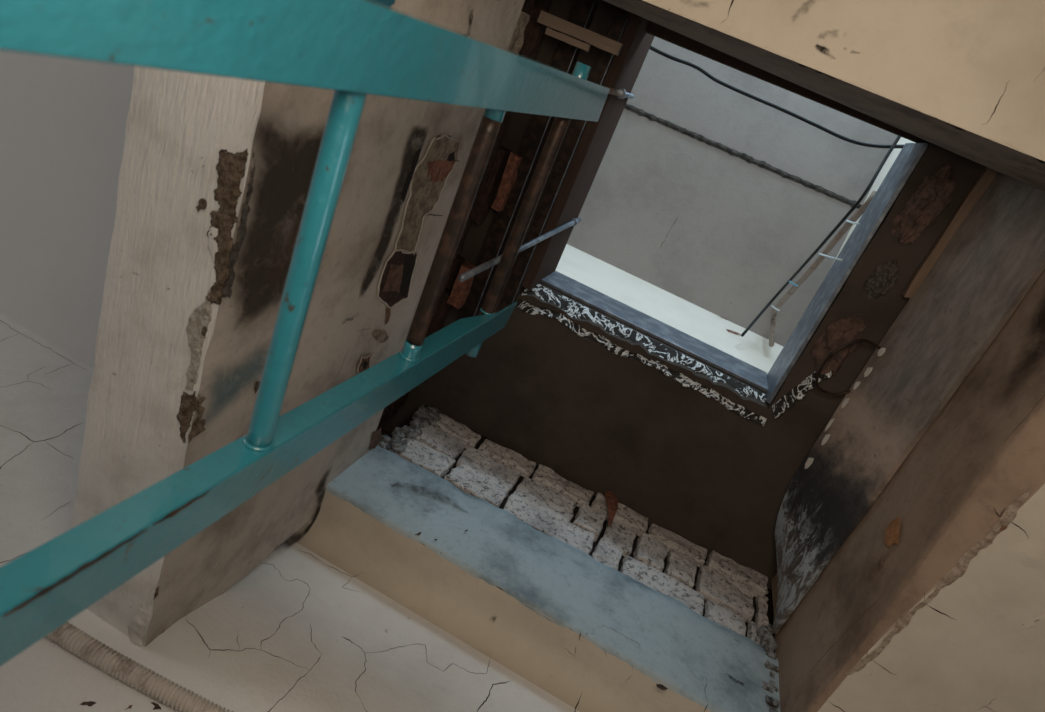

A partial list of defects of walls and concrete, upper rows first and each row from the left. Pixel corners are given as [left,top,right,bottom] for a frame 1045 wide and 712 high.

spalling [177,149,256,443]
flaking render [357,354,372,374]
flaking render [373,134,462,343]
crack [0,424,79,486]
crack [162,563,322,712]
crack [343,637,509,712]